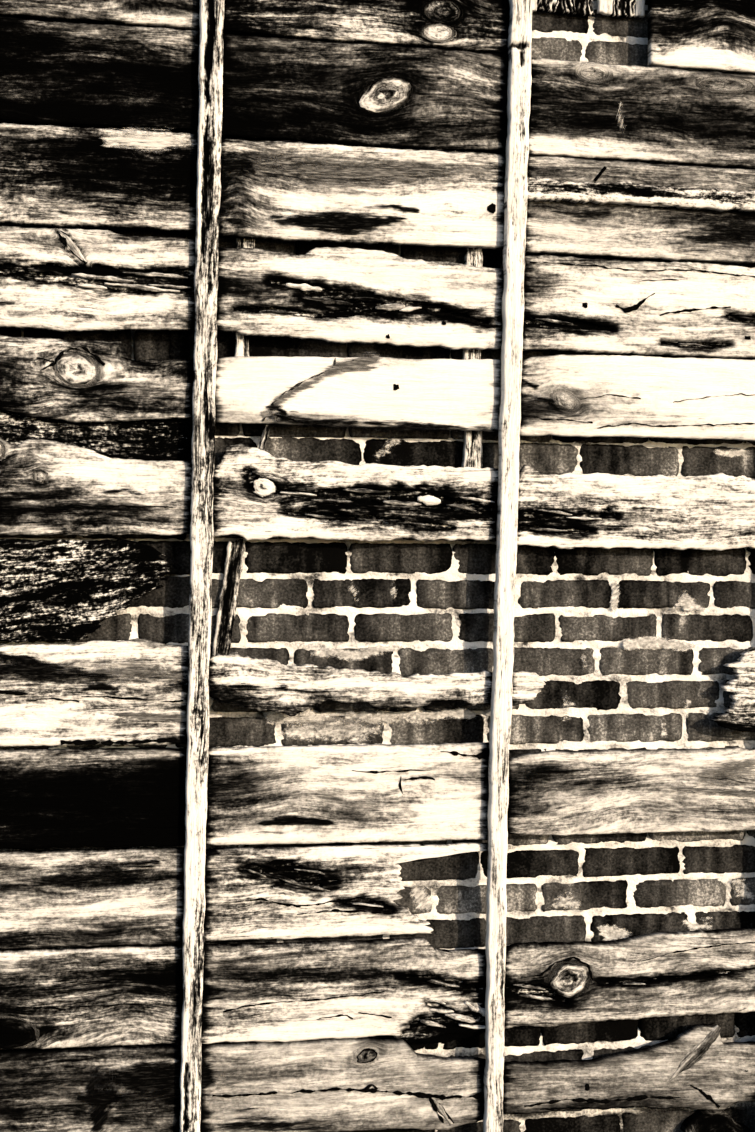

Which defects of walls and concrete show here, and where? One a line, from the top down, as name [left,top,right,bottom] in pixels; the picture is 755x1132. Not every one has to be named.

crack [212,1084,484,1124]